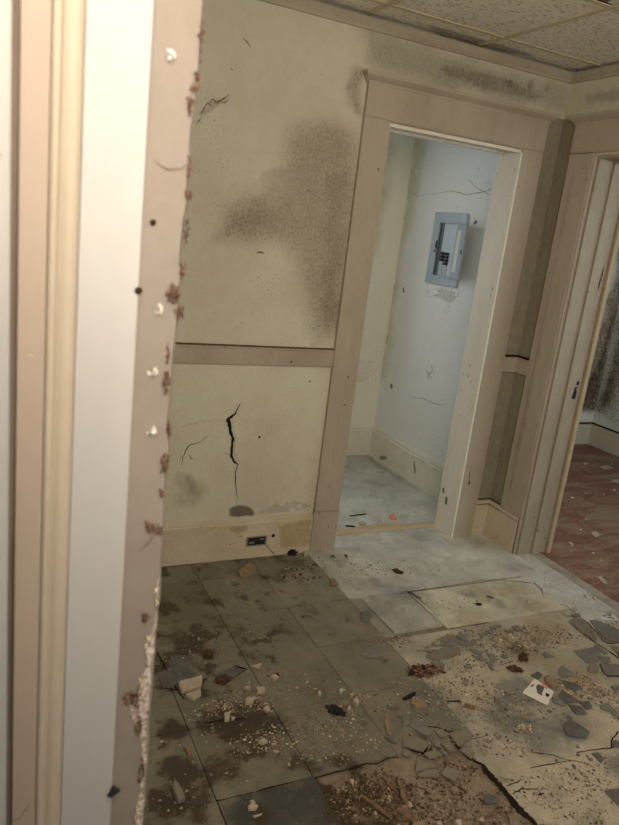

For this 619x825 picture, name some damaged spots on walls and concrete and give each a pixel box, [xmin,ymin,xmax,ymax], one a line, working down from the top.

peeling [178,218,191,278]
damp [582,271,619,421]
crack [222,403,242,498]
peeling [122,687,142,737]